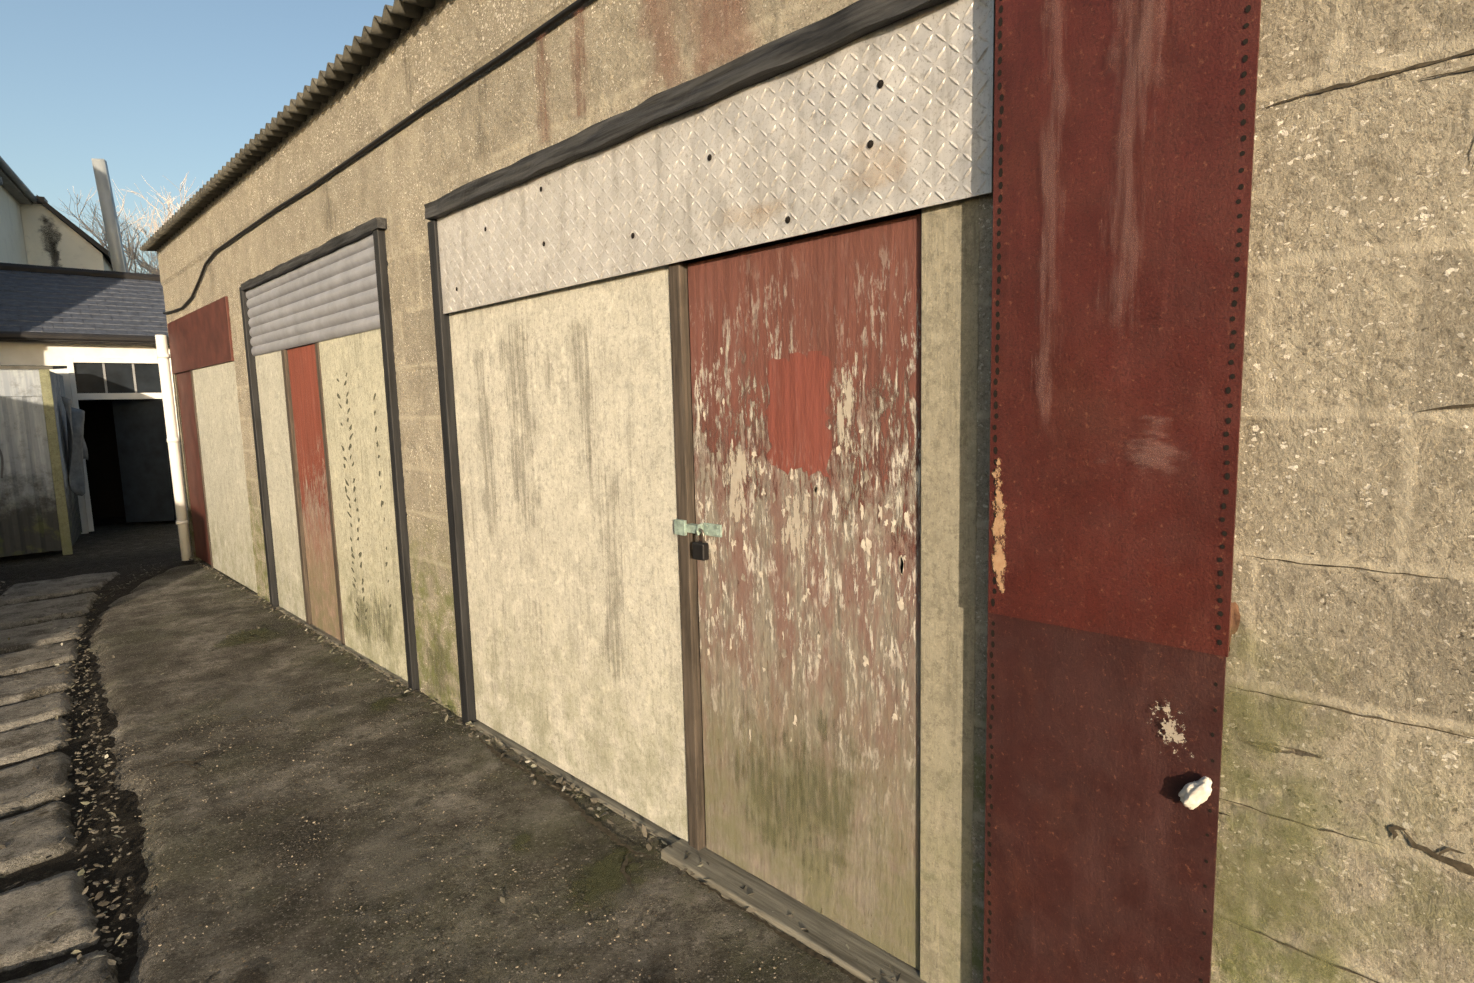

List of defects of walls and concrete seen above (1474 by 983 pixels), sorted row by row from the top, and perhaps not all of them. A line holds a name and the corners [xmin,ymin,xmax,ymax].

crack [1261,49,1474,109]
crack [1419,404,1474,412]
peeling [833,367,909,570]
peeling [699,393,819,650]
peeling [888,553,906,578]
corrosion [991,459,1007,593]
crack [1219,798,1474,877]